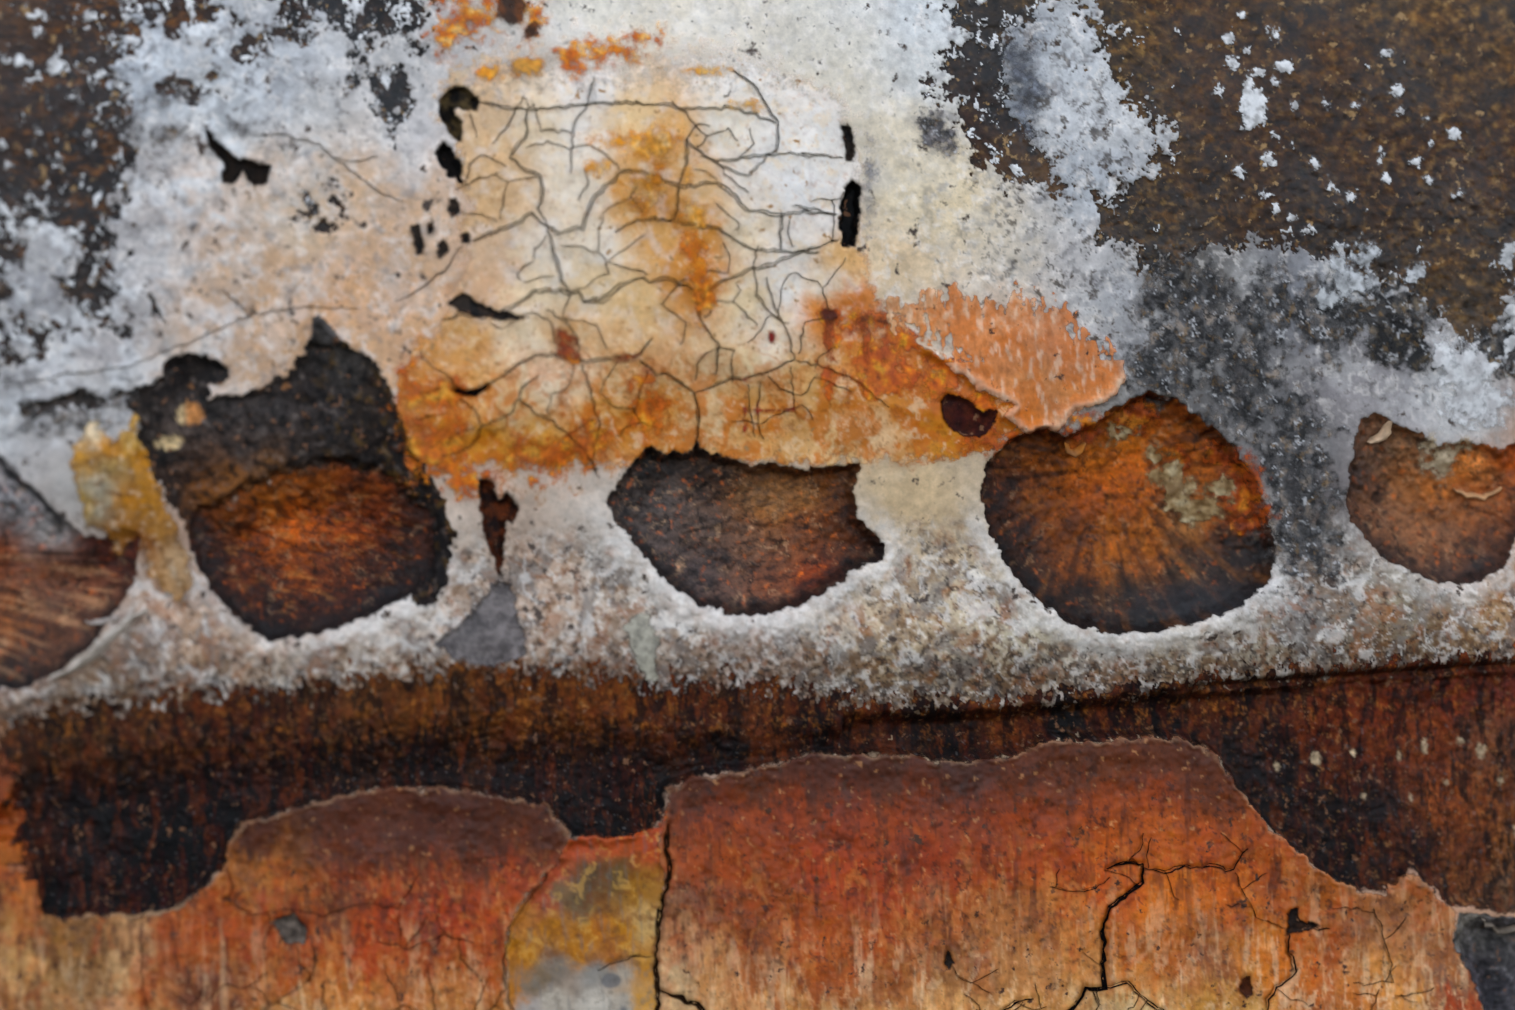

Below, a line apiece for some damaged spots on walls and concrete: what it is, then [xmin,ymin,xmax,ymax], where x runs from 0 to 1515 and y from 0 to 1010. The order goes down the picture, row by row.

damp [1005,29,1048,137]
crack [408,70,889,474]
peeling [17,315,458,607]
peeling [885,281,1126,458]
damp [1106,242,1515,605]
peeling [1366,421,1392,444]
peeling [48,608,150,683]
crack [141,859,561,1010]
crack [597,823,705,1010]
peeling [0,734,1515,1010]
crack [952,833,1434,1010]